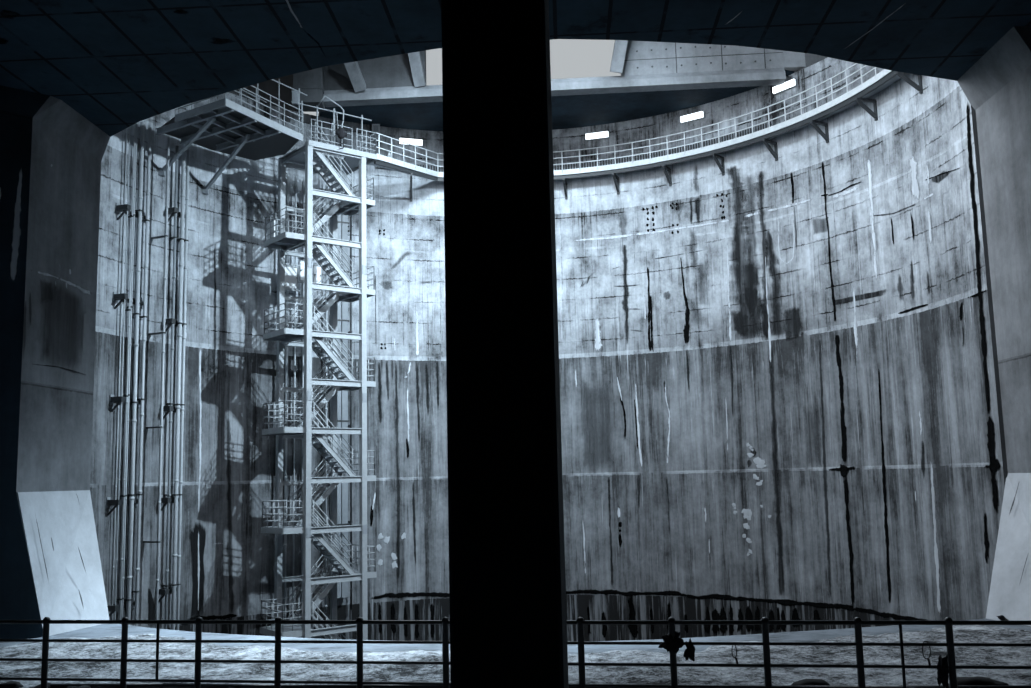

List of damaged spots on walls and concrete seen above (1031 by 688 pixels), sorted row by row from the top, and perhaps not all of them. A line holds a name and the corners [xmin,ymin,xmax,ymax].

peeling [376,532,407,568]
leakage [566,161,927,638]
peeling [732,503,771,556]
peeling [746,442,766,486]
crack [789,173,797,247]
crack [821,162,861,610]
leakage [919,411,941,612]
crack [873,103,1019,513]